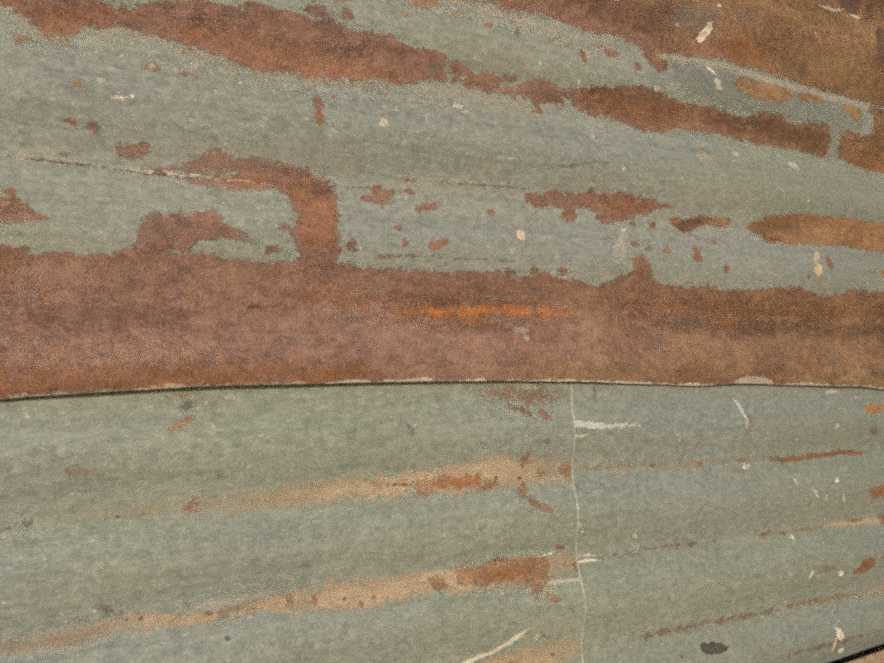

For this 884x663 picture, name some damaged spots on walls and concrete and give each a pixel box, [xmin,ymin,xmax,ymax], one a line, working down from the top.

corrosion [0,0,884,174]
peeling [672,63,867,141]
corrosion [0,144,884,399]
peeling [814,251,822,276]